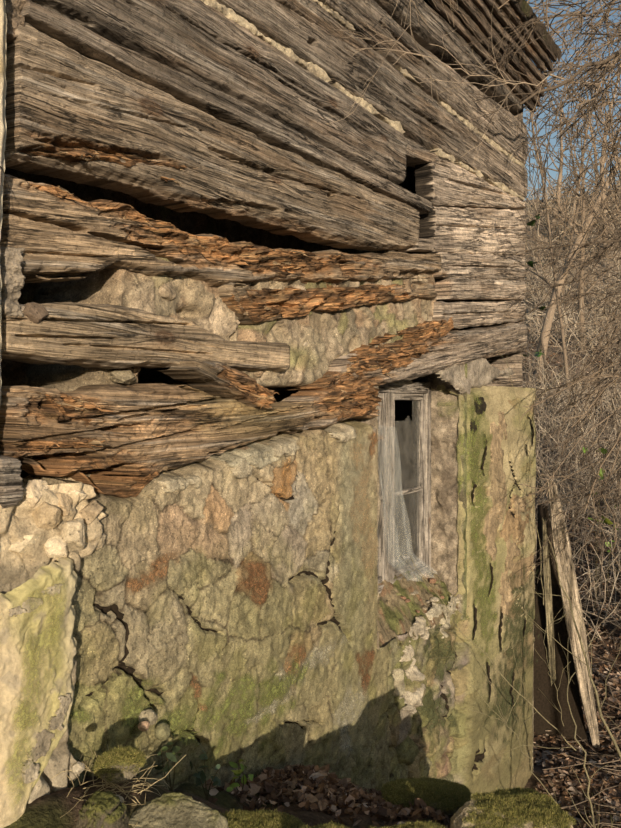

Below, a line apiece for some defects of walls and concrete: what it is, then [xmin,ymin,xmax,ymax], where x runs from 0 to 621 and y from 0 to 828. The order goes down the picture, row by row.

crack [472,435,487,506]
flaking render [9,479,87,558]
crack [179,596,217,633]
crack [288,531,344,634]
crack [473,563,494,640]
crack [86,603,164,706]
spalling [392,595,461,714]
crack [440,652,457,718]
crack [487,612,515,708]
crack [183,708,200,743]
crack [472,745,486,776]